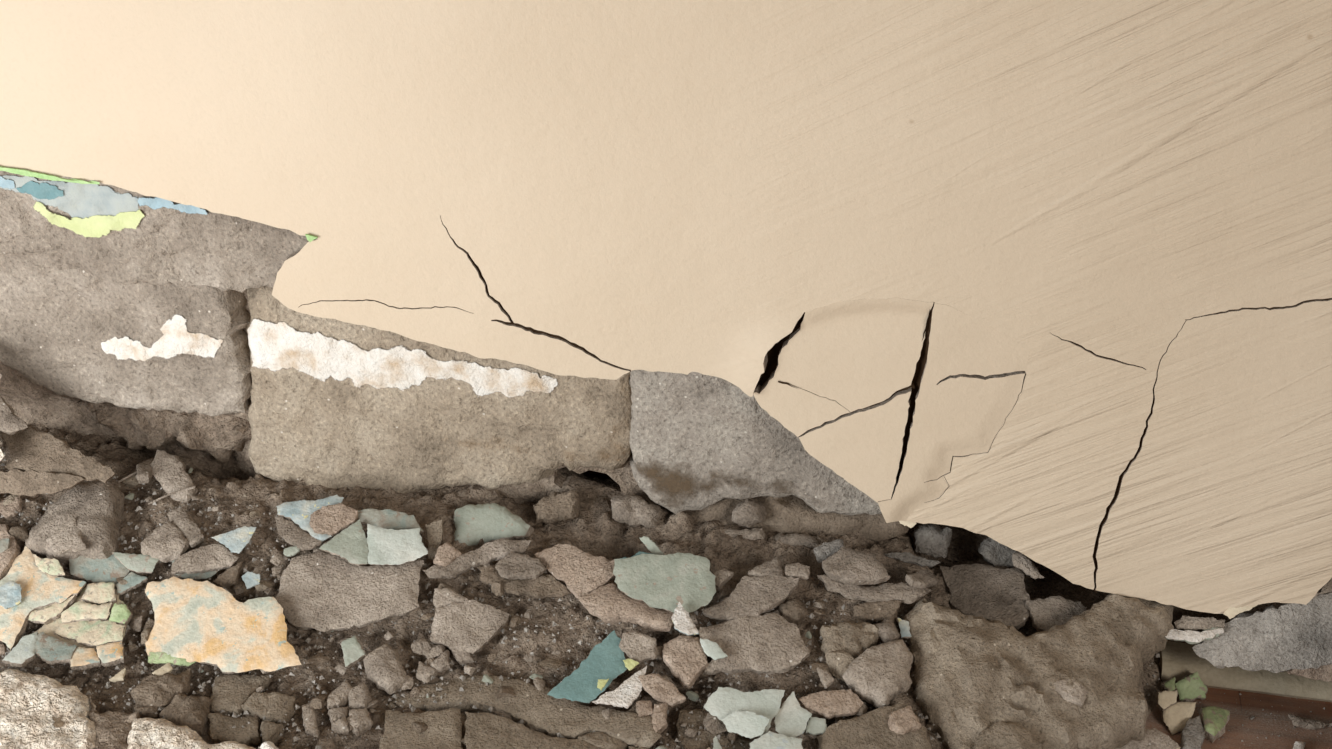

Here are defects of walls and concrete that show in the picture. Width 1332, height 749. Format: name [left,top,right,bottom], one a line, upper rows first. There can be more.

crack [299,222,631,372]
spalling [0,166,1064,584]
crack [755,312,807,391]
crack [803,302,935,494]
crack [1057,298,1332,592]
peeling [242,572,260,589]
peeling [896,618,912,638]
spalling [1172,602,1285,632]